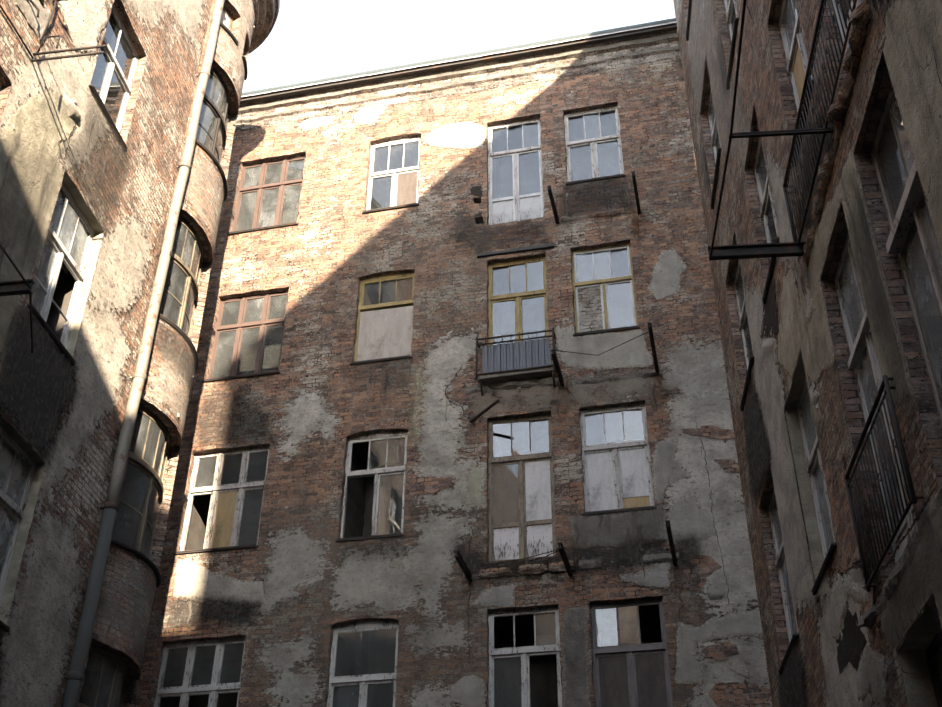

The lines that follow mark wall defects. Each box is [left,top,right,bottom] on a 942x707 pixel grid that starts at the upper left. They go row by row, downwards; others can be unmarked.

peeling [765,149,798,243]
flaking render [777,256,816,323]
peeling [252,327,773,707]
crack [679,414,730,612]
peeling [743,276,892,707]